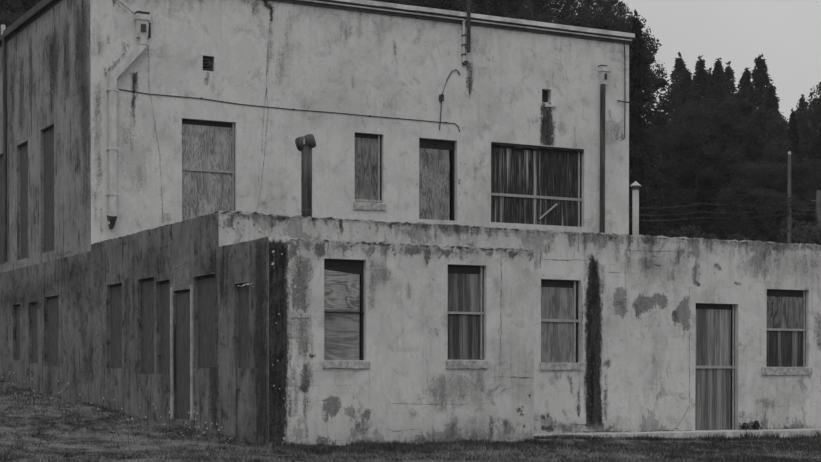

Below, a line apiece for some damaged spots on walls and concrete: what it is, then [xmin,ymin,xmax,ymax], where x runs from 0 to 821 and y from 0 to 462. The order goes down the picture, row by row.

water stain [249,239,313,444]
water stain [574,235,610,428]
peeling [613,287,691,338]